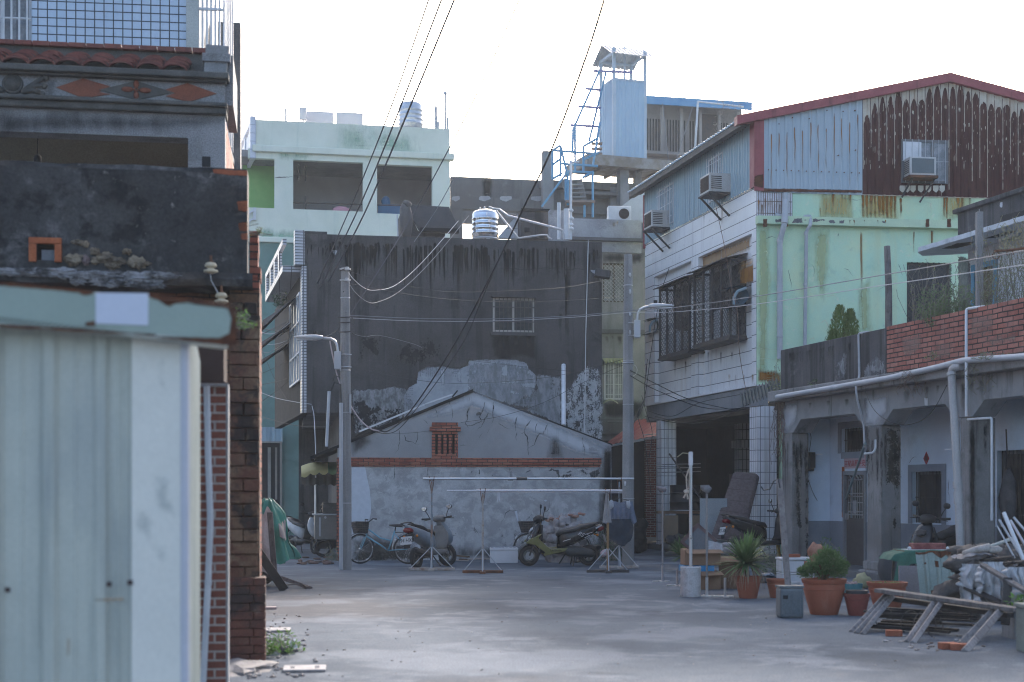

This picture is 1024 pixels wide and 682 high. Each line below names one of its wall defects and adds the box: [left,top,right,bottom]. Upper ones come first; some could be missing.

corrosion [754,83,1024,218]
leakage [307,238,576,321]
crack [394,402,548,478]
peeling [352,358,603,439]
leakage [866,425,901,489]
leakage [785,442,809,557]